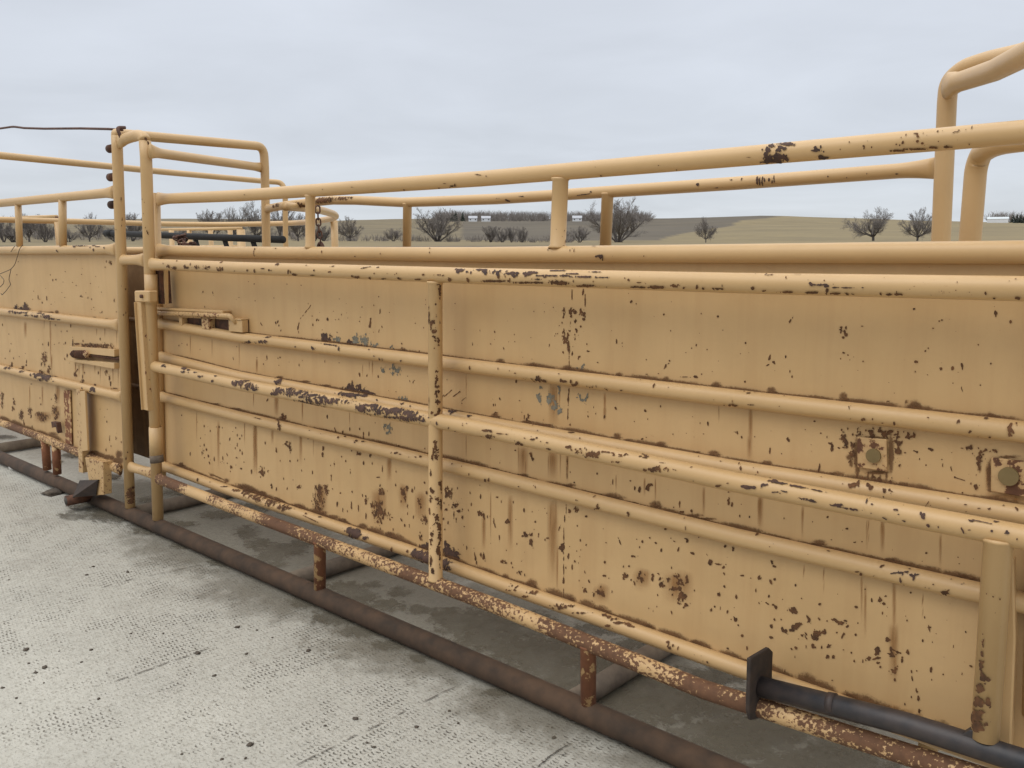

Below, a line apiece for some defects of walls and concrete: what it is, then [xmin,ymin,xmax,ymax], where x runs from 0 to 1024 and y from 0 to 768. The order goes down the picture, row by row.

peeling [760,142,795,164]
rust [0,416,61,441]
spalling [190,425,429,549]
peeling [231,296,472,439]
rust [166,392,747,663]
peeling [443,486,561,576]
peeling [437,268,608,369]
rust [177,355,1019,503]
peeling [622,526,748,650]
rust [549,482,980,582]
peeling [740,561,922,713]
rust [772,665,898,710]